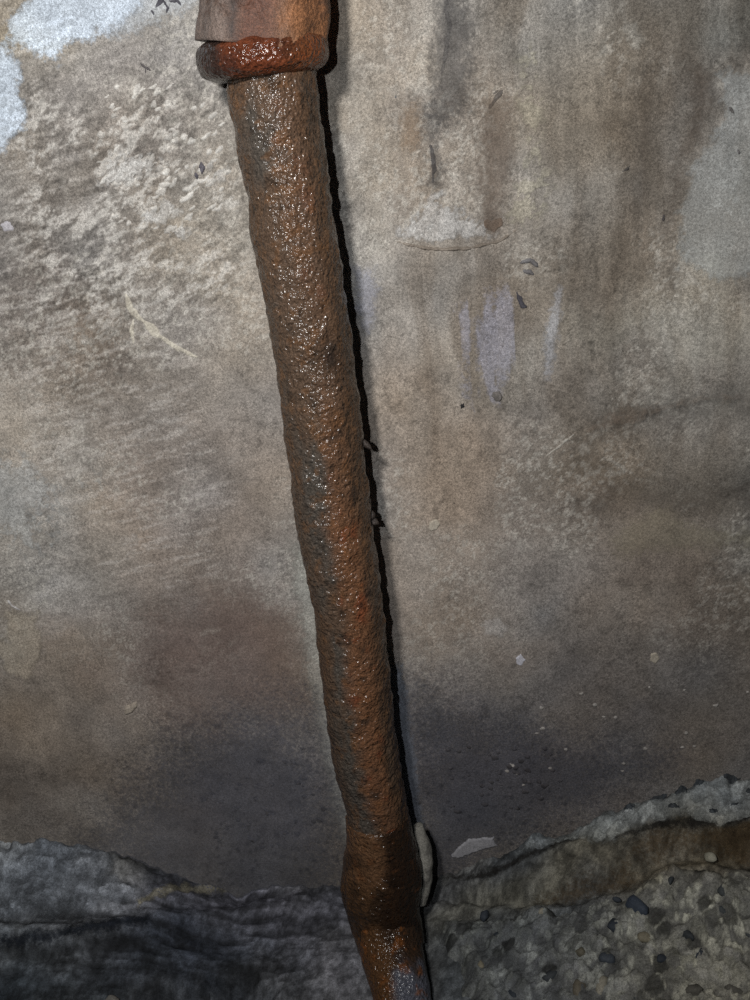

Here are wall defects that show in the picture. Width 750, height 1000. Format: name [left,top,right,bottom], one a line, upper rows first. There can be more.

damp [423,0,474,186]
damp [459,294,515,398]
damp [545,289,562,375]
damp [91,705,346,899]
flaking render [451,836,498,858]
damp [413,707,642,879]
flaking render [519,773,750,854]
spalling [441,852,750,1000]